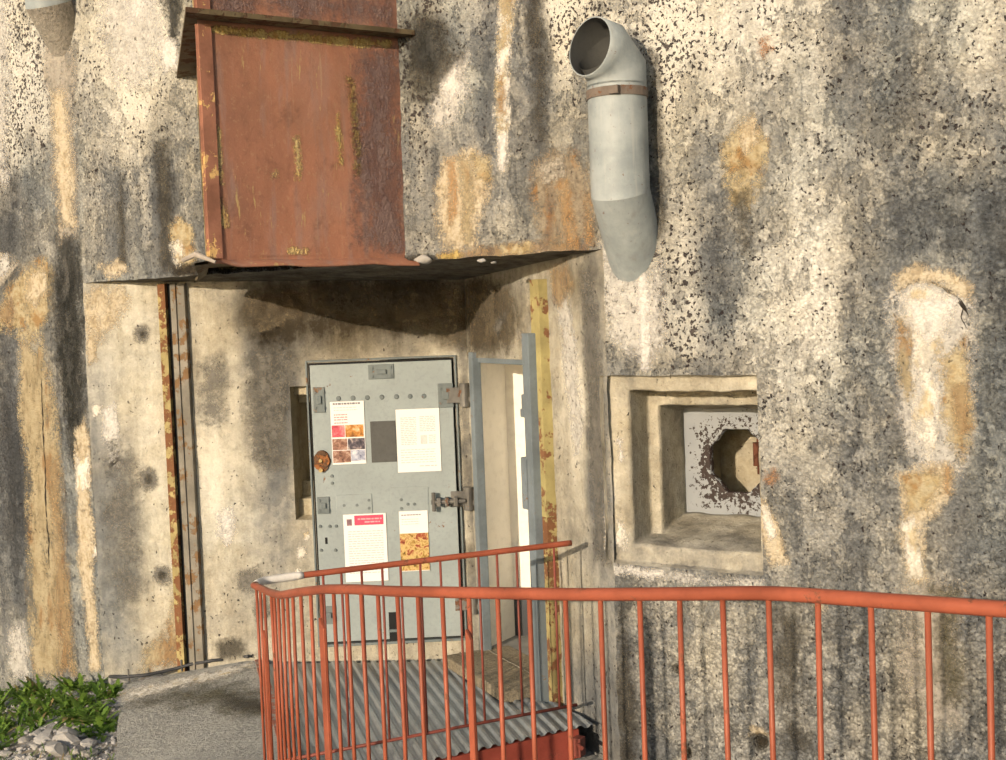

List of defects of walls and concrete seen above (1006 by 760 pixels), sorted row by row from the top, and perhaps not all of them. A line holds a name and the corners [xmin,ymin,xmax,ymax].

corrosion [353,48,406,253]
water stain [200,358,225,425]
water stain [246,344,294,470]
crack [41,380,50,567]
water stain [7,622,31,681]